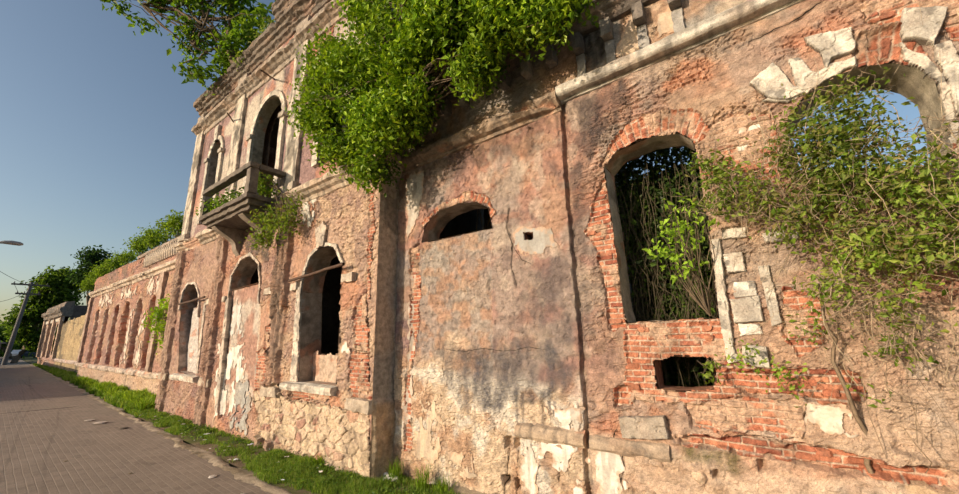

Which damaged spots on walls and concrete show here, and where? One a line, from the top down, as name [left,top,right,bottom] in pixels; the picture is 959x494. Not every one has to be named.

spalling [854,0,959,69]
flaking render [300,198,317,232]
crack [506,212,531,286]
spalling [340,192,376,400]
spalling [584,107,959,494]
spalling [214,300,371,478]
flaking render [512,431,629,494]